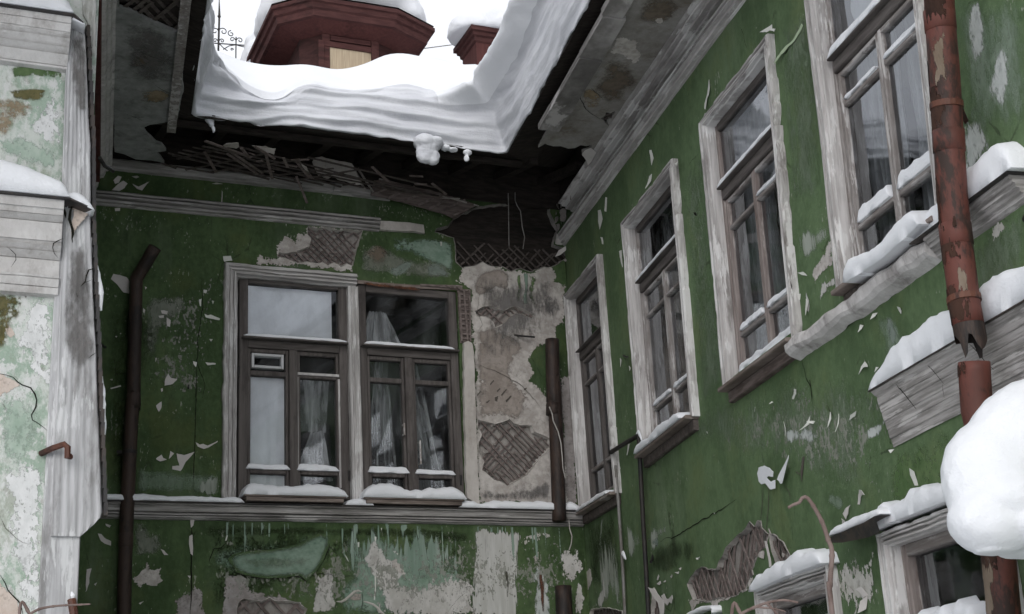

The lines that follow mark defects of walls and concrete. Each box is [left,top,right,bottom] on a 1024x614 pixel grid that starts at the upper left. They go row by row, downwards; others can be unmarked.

water stain [641,0,676,21]
corrosion [924,0,946,24]
water stain [584,62,633,107]
corrosion [927,61,946,131]
flaking render [256,224,352,272]
corrosion [935,178,961,269]
corrosion [946,284,971,325]
flaking render [456,196,571,503]
crack [3,374,43,427]
peeling [0,466,43,614]
crack [660,500,735,542]
peeling [218,520,619,614]